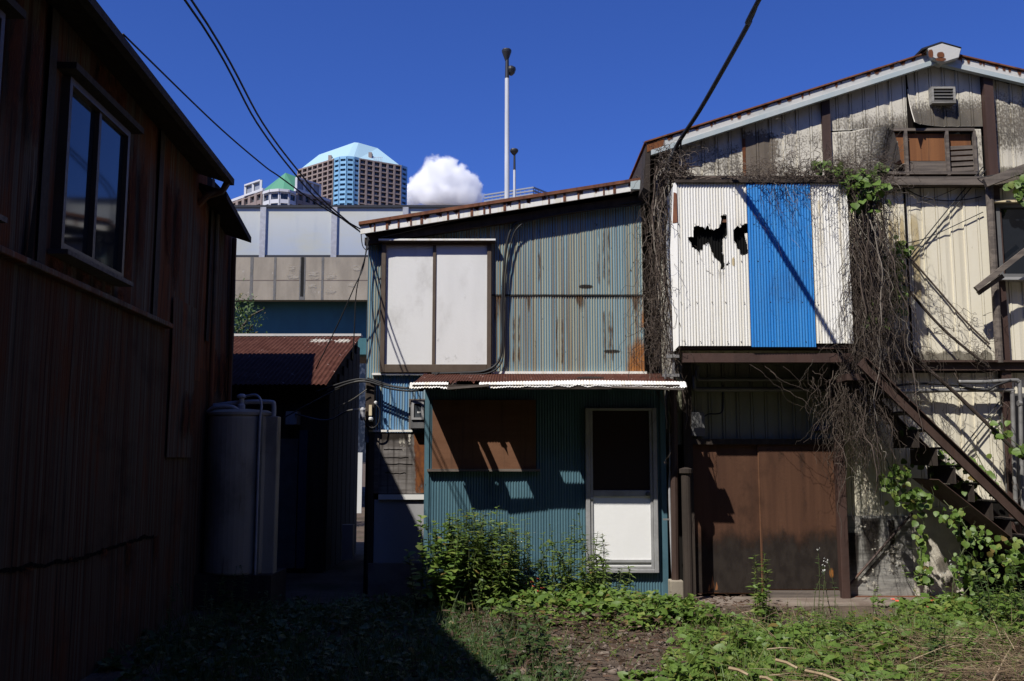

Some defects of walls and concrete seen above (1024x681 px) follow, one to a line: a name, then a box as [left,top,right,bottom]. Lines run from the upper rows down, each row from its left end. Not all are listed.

corrosion [603,312,645,371]